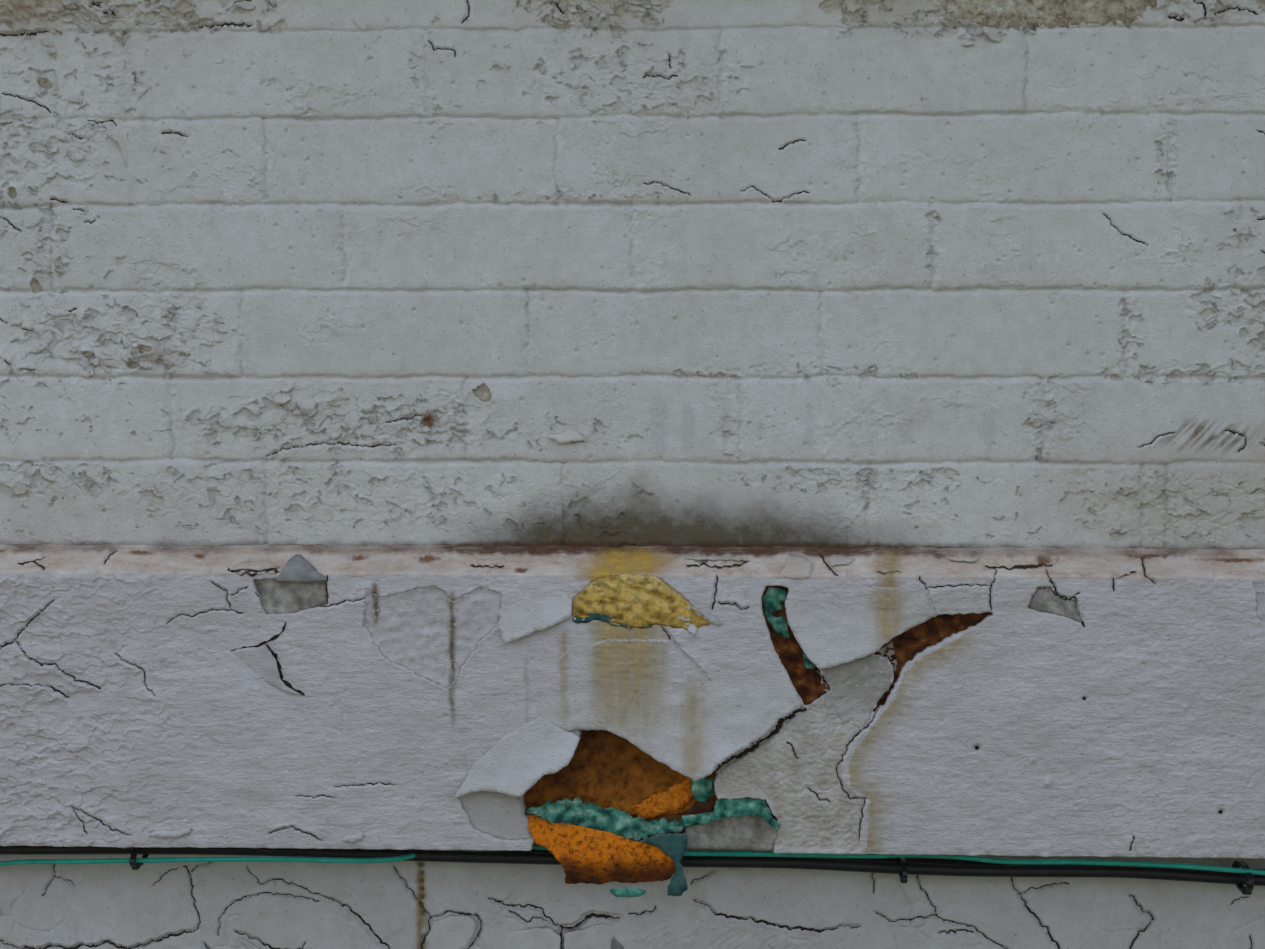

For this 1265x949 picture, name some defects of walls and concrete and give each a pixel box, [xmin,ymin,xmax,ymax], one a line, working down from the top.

crack [1168,0,1258,22]
crack [0,600,101,698]
crack [167,581,260,624]
peeling [227,554,329,696]
rust [596,622,654,703]
peeling [363,553,992,898]
crack [268,782,395,841]
crack [0,862,389,949]
rust [417,861,425,949]
crack [393,866,656,949]
crack [691,871,1008,949]
crack [1011,877,1069,949]